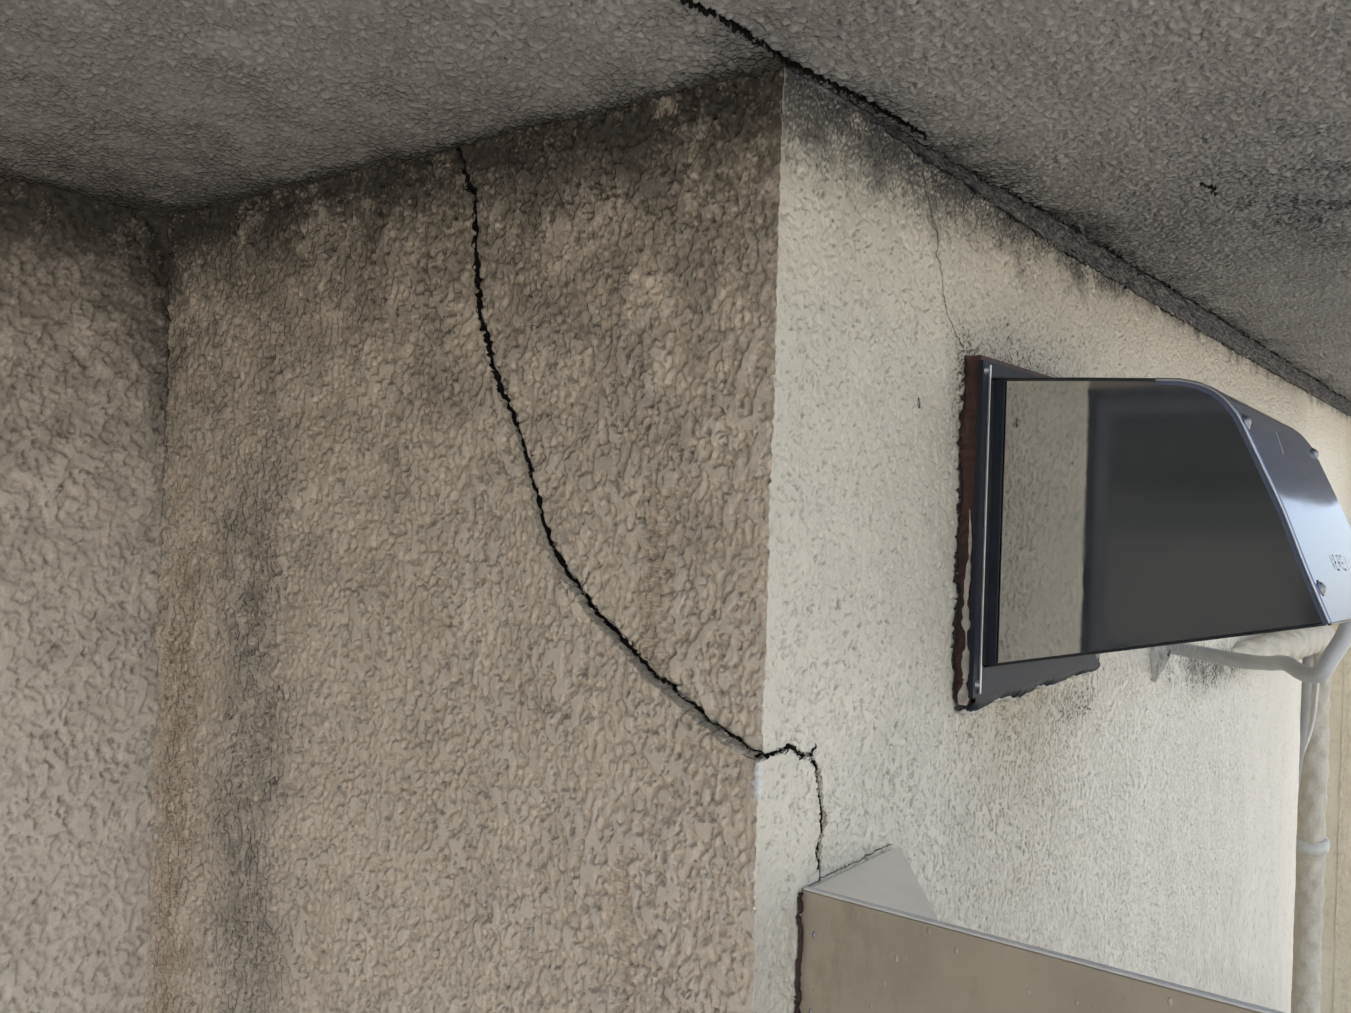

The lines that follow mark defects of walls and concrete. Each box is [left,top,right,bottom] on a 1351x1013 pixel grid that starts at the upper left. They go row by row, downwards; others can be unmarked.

damp [0,58,1215,425]
crack [679,0,926,140]
crack [923,173,965,349]
crack [456,147,828,880]